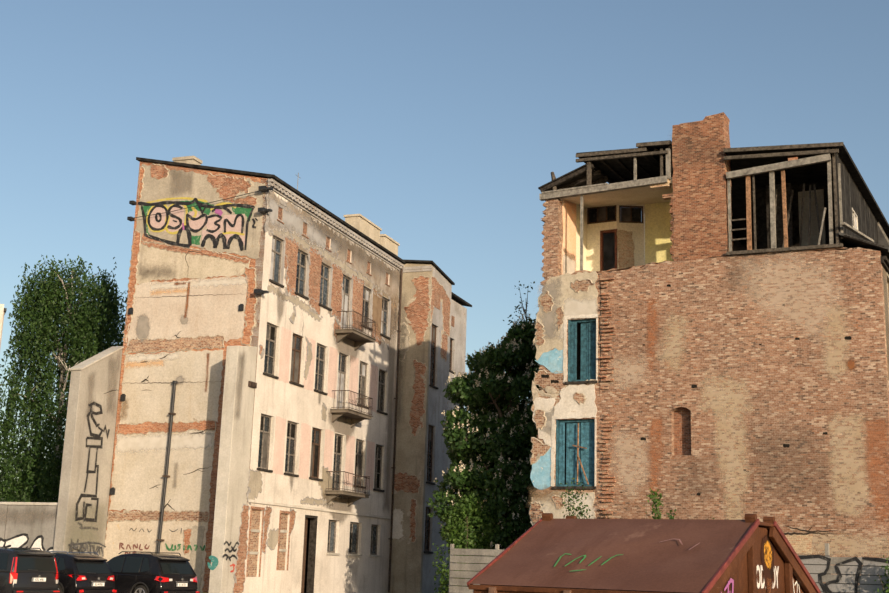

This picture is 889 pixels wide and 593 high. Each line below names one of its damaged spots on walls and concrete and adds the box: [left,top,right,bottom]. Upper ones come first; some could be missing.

flaking render [138,163,170,199]
flaking render [117,173,451,437]
flaking render [533,290,565,349]
spalling [530,369,598,465]
flaking render [107,509,210,555]
flaking render [232,469,263,593]
flaking render [262,466,334,554]
flaking render [390,471,421,544]
flaking render [529,501,544,524]